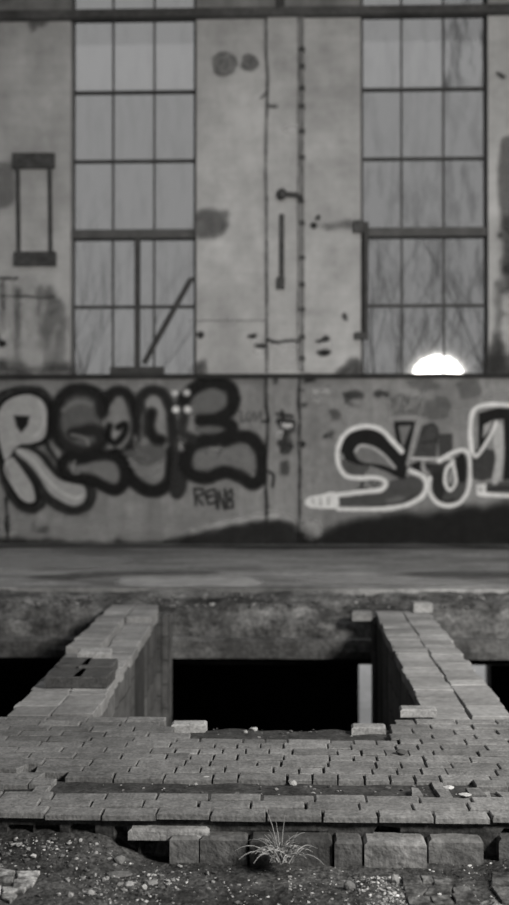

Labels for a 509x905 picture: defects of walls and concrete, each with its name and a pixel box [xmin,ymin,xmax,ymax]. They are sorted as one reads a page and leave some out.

water stain [214,52,258,75]
water stain [195,210,227,238]
peeling [498,137,509,290]